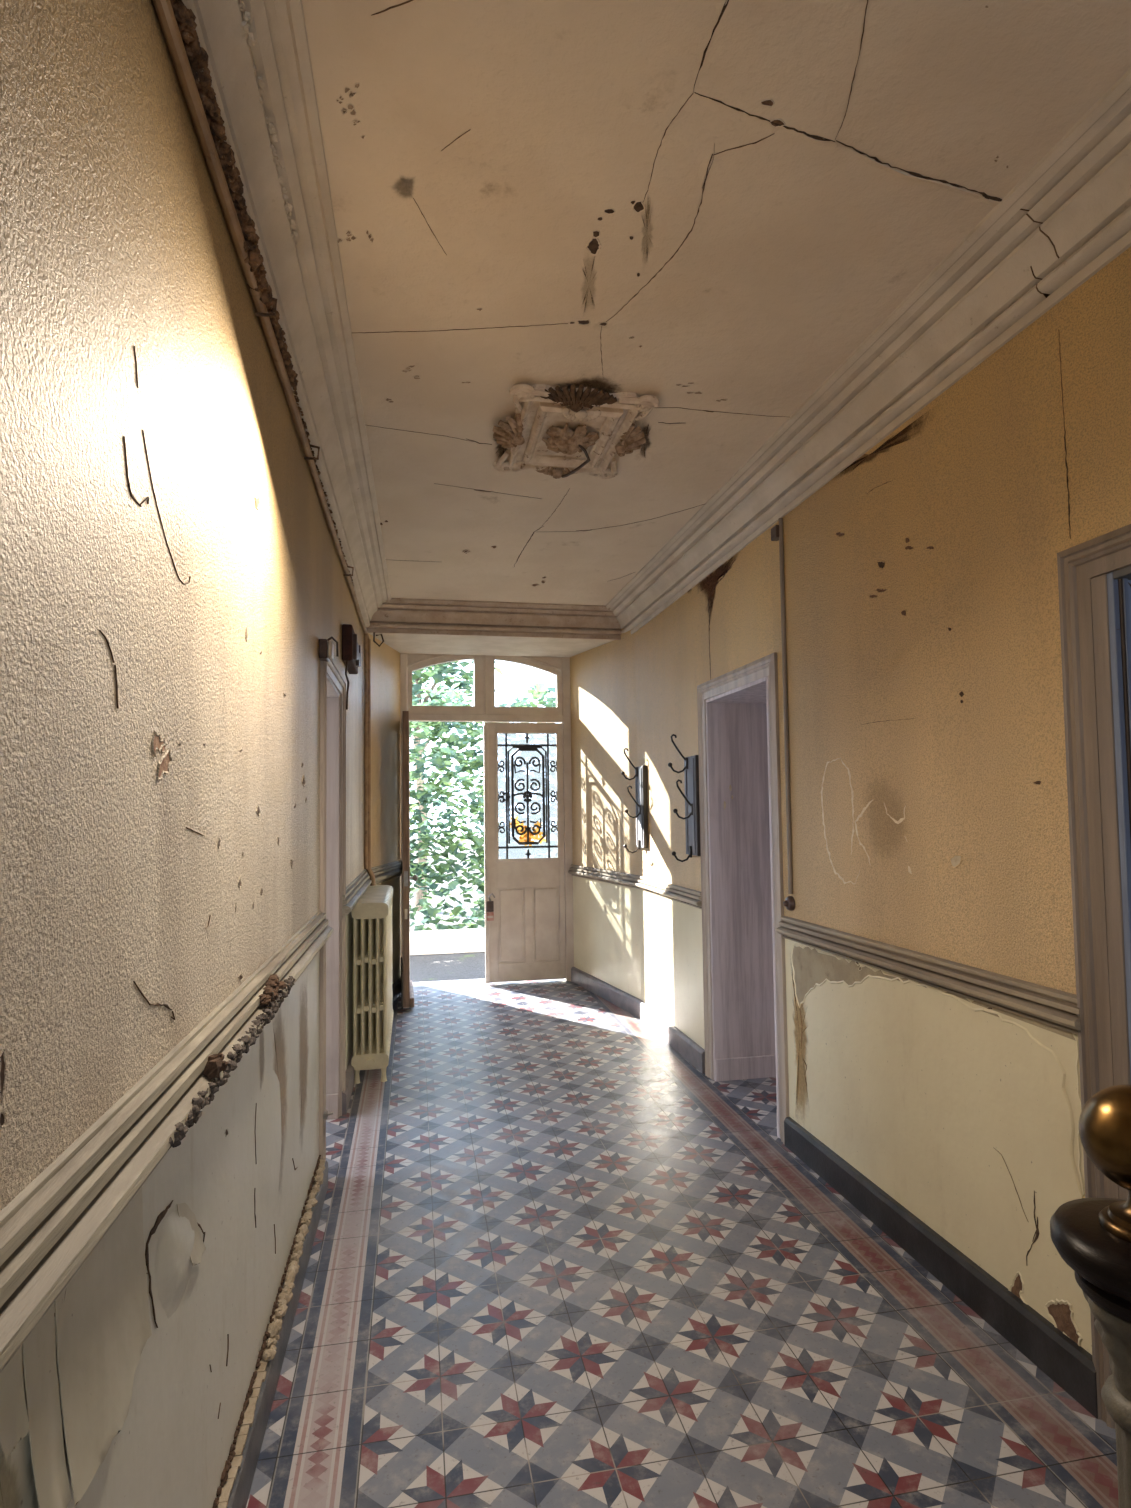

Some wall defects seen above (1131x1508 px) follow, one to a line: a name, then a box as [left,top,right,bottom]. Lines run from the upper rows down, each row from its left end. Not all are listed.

flaking render [170,0,298,388]
crack [357,0,1071,539]
crack [439,484,704,567]
flaking render [168,974,295,1150]
peeling [791,944,1085,1199]
peeling [0,1186,152,1508]
crack [993,1147,1039,1297]